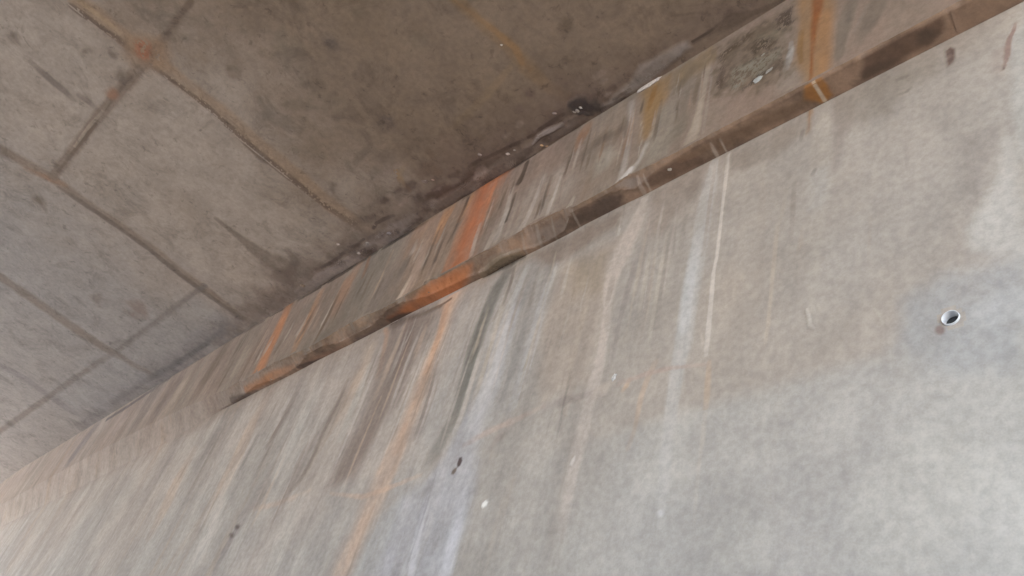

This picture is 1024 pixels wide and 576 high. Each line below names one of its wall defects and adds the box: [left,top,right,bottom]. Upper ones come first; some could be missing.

rust [242,254,372,392]
leakage [39,0,785,471]
rust [327,166,516,576]
leakage [352,0,1024,576]
rust [791,0,841,104]